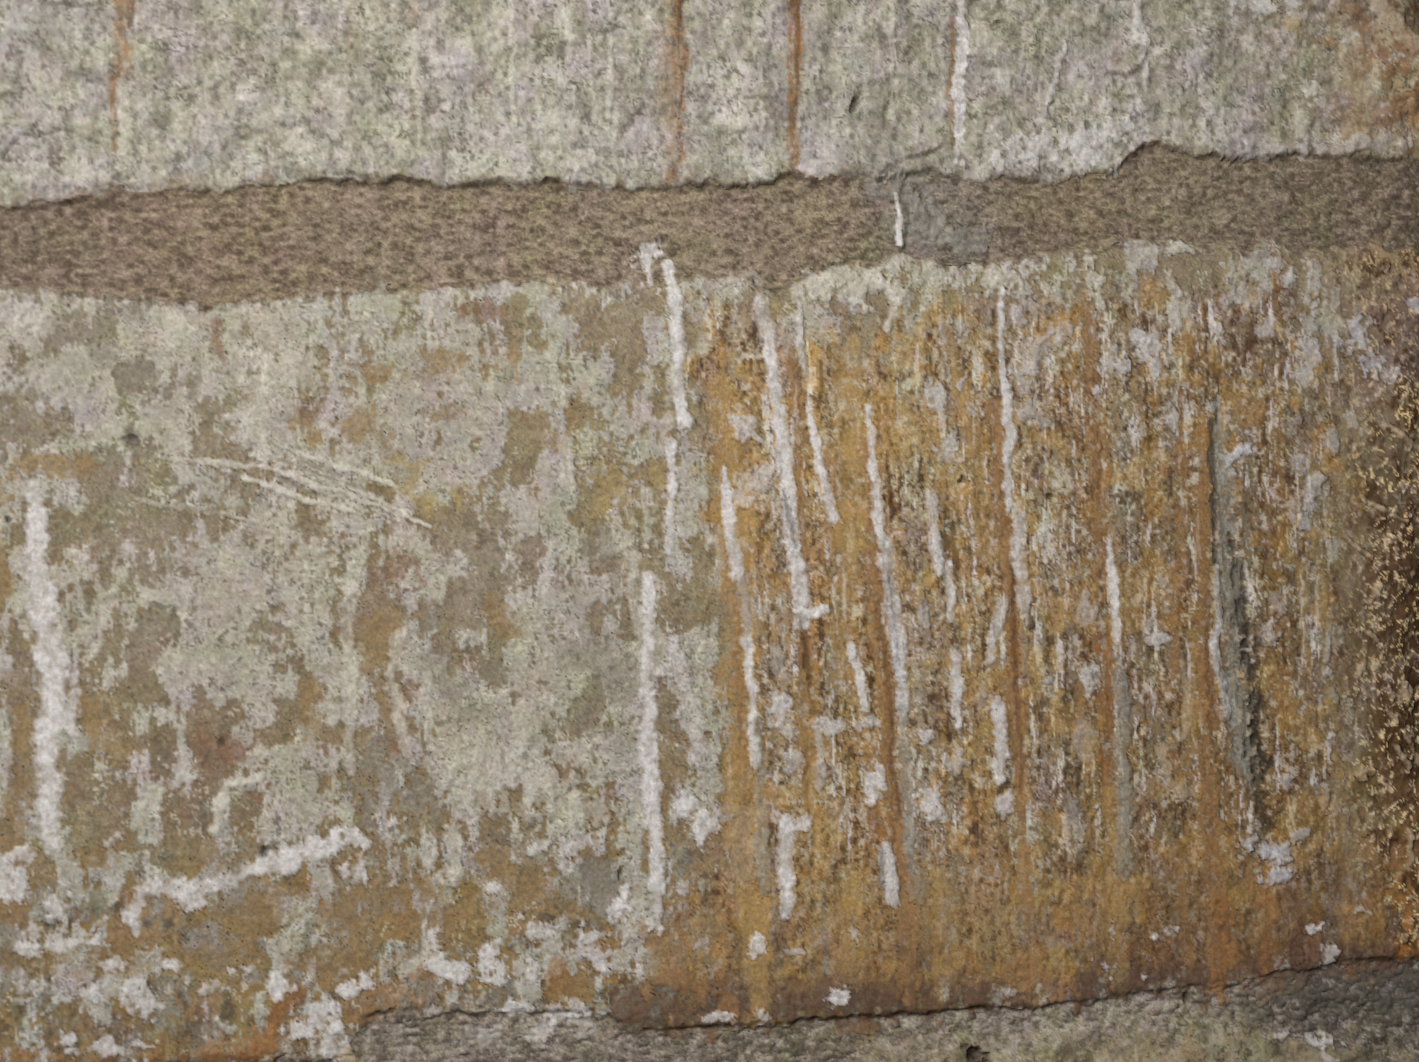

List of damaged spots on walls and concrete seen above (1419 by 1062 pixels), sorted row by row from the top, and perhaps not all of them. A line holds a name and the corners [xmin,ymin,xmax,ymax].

rust [103,0,141,157]
rust [340,0,365,65]
rust [649,0,694,186]
rust [782,0,808,172]
water stain [1290,260,1419,402]
water stain [0,476,167,1060]
water stain [381,160,1074,983]
rust [599,254,1419,1054]
water stain [1068,536,1200,883]
efflorescence [119,824,400,938]
efflorescence [196,963,377,1062]
water stain [418,908,613,1055]